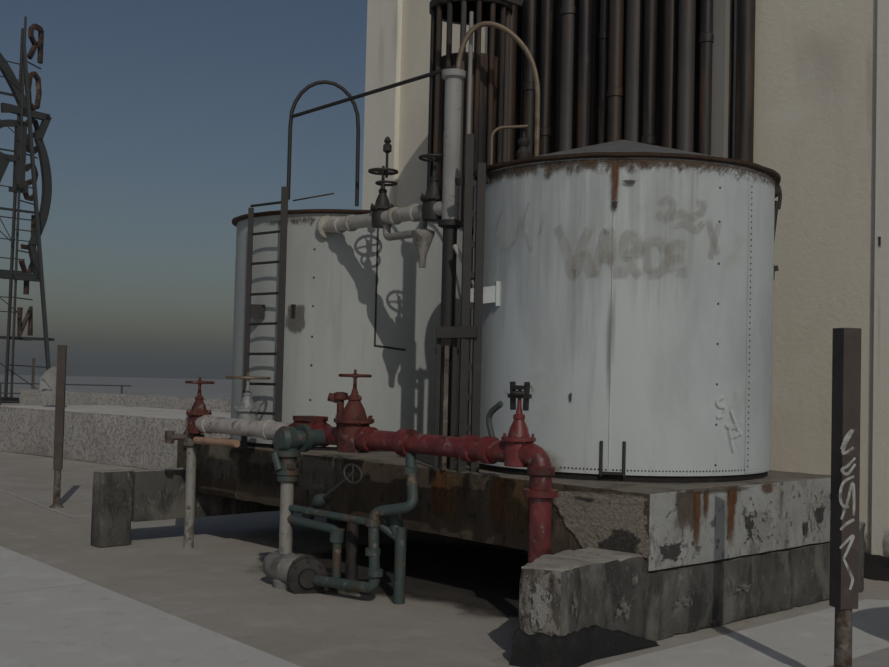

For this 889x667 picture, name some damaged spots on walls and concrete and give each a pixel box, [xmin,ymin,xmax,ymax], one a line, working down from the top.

corrosion [486,159,776,209]
spalling [553,491,686,561]
corrosion [676,486,749,543]
peeling [744,508,773,547]
peeling [803,493,831,537]